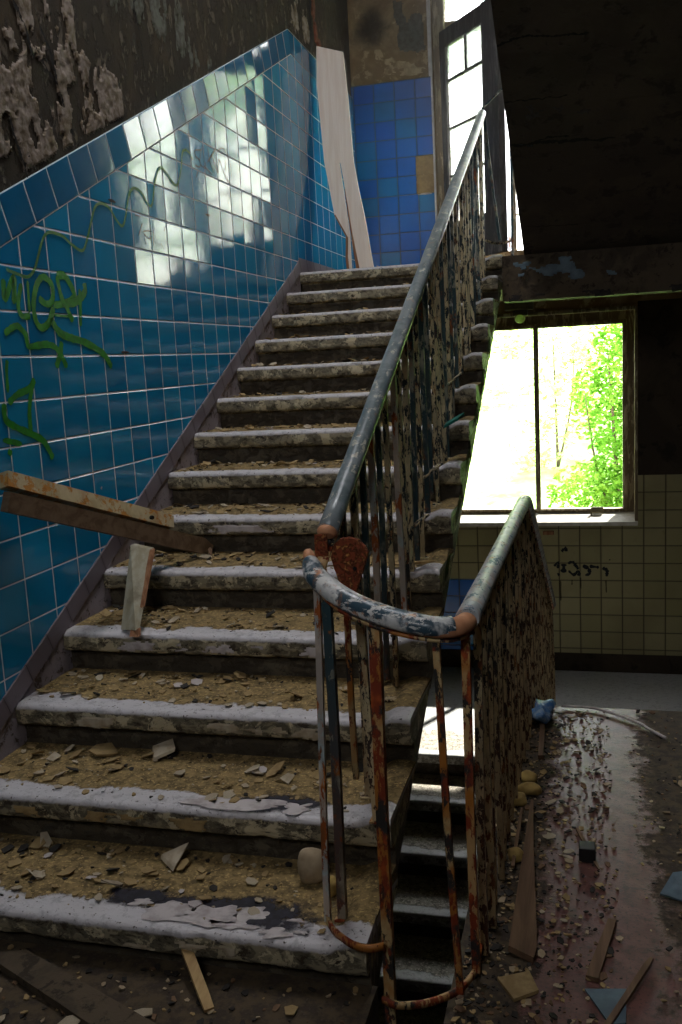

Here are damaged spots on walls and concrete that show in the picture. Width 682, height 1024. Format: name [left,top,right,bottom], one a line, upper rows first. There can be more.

flaking render [0,0,124,172]
peeling [416,155,434,195]
peeling [127,889,309,939]